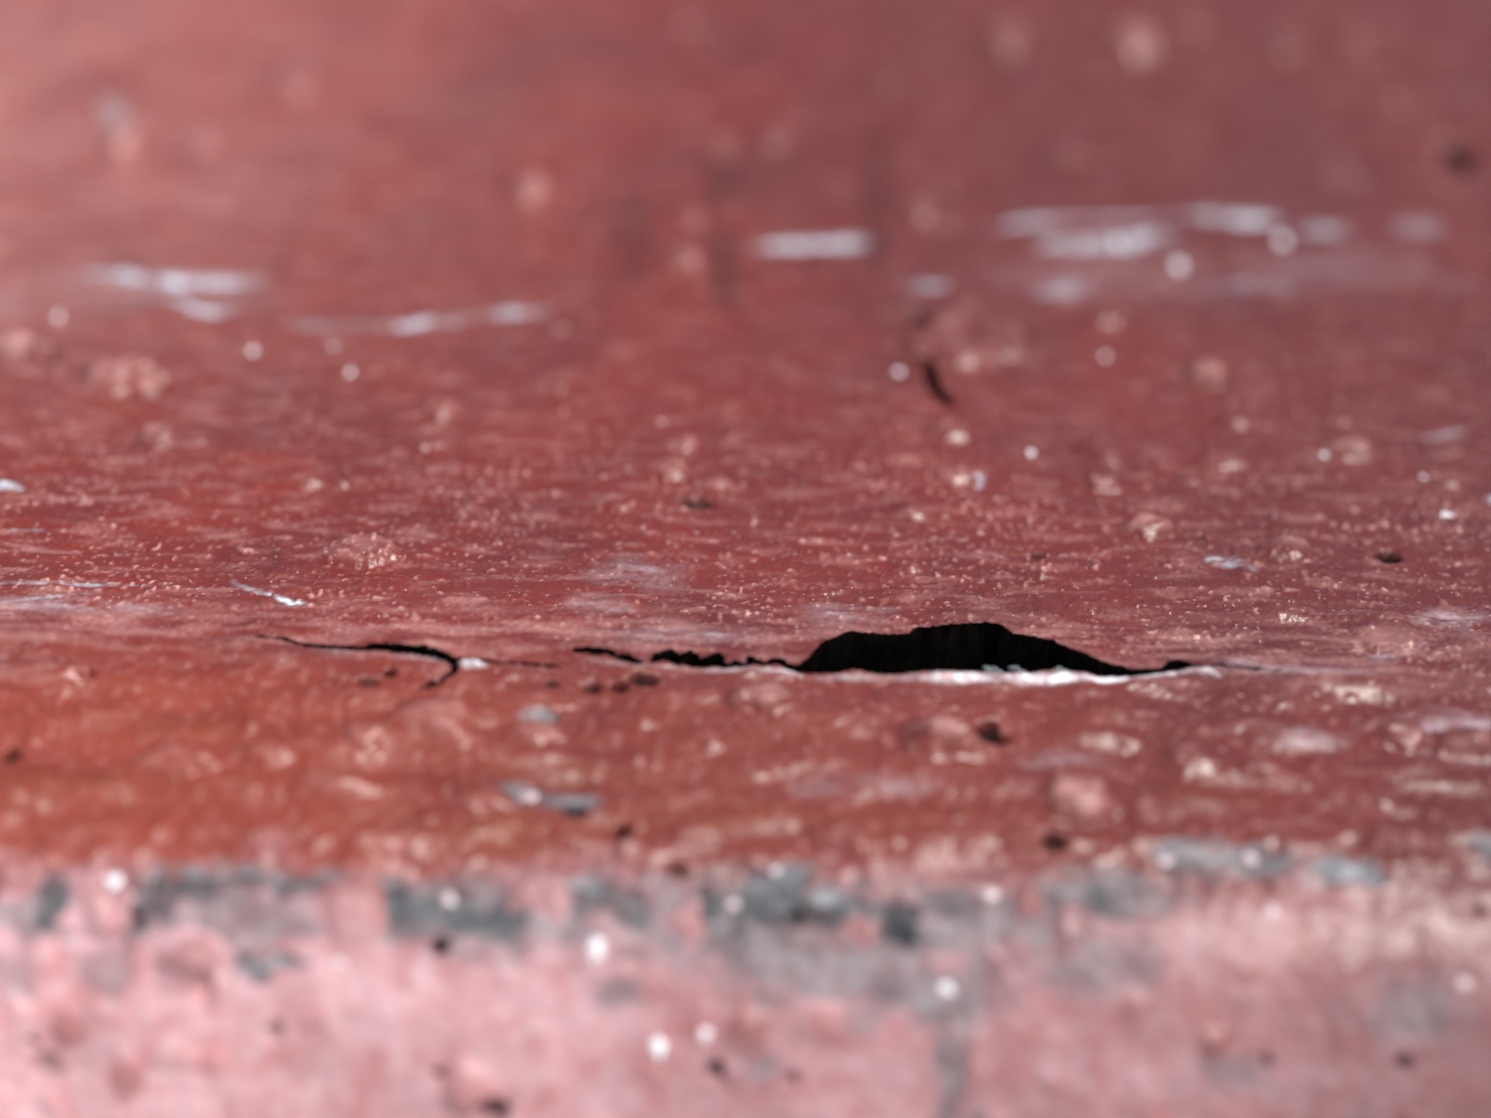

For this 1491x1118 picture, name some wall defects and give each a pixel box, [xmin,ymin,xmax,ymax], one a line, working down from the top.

crack [255,621,1282,689]